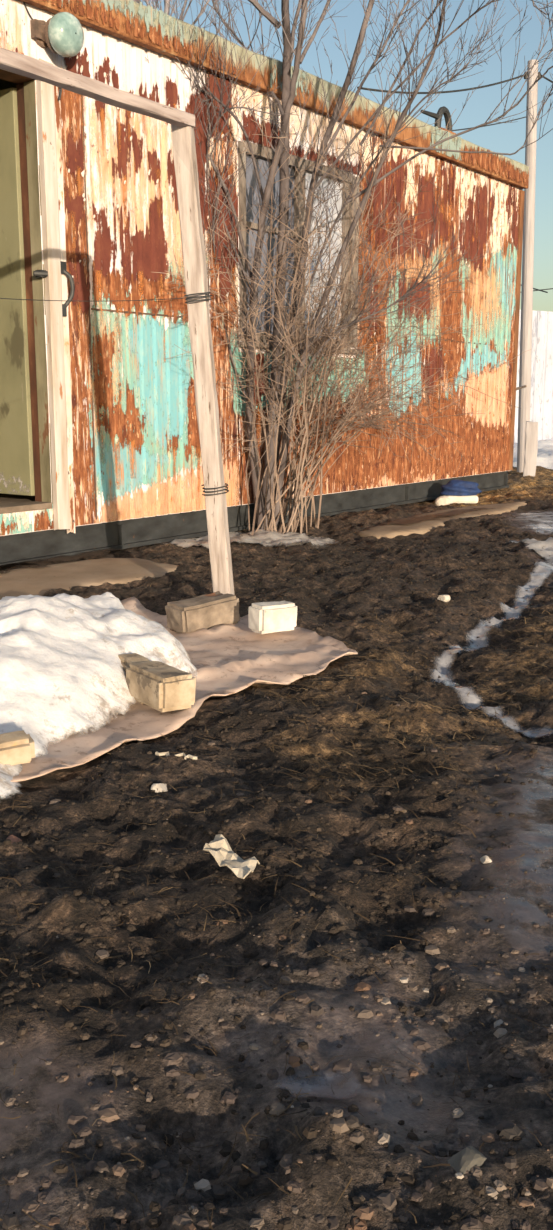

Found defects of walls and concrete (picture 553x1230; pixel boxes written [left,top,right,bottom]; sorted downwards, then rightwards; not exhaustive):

rust [0,9,22,54]
peeling [61,0,205,46]
rust [44,0,529,526]
peeling [64,47,520,523]
rust [1,517,18,535]
rust [34,509,54,531]